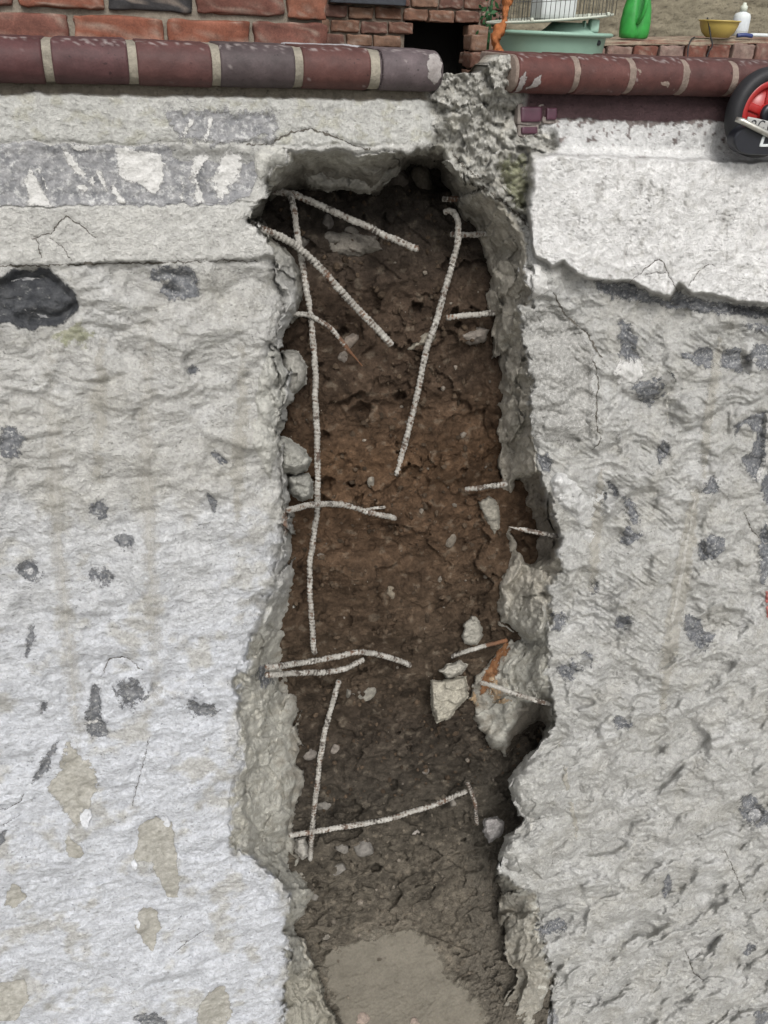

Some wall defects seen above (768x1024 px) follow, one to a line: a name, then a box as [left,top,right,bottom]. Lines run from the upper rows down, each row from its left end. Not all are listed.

crack [0,215,257,268]
crack [630,259,714,291]
spalling [394,195,495,476]
crack [553,292,603,450]
spalling [465,481,508,492]
spalling [251,188,479,861]
spalling [510,527,559,539]
spalling [451,638,508,658]
corrosion [468,642,512,707]
spalling [480,680,552,707]
spalling [535,917,567,936]